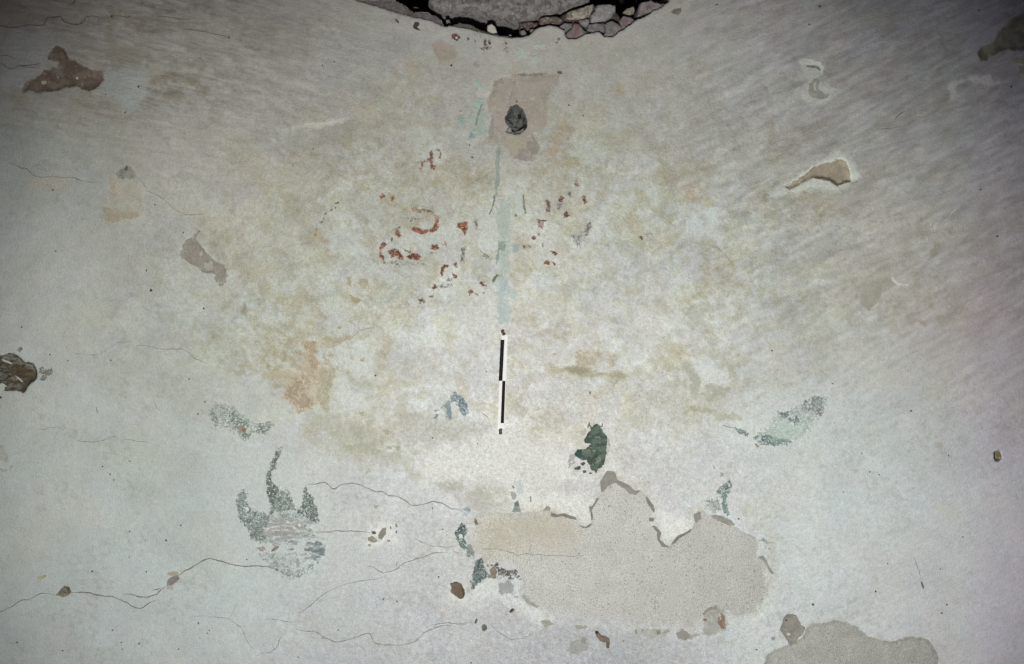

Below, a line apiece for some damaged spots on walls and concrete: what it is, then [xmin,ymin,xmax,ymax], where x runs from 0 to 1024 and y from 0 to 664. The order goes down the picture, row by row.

crack [0,0,122,28]
flaking render [356,0,525,69]
flaking render [557,0,681,35]
flaking render [22,46,106,95]
flaking render [785,157,859,192]
flaking render [179,230,228,287]
flaking render [0,347,53,398]
peeling [734,427,791,446]
crack [0,558,298,612]
crack [194,482,466,653]
flaking render [467,462,774,656]
flaking render [756,614,938,664]